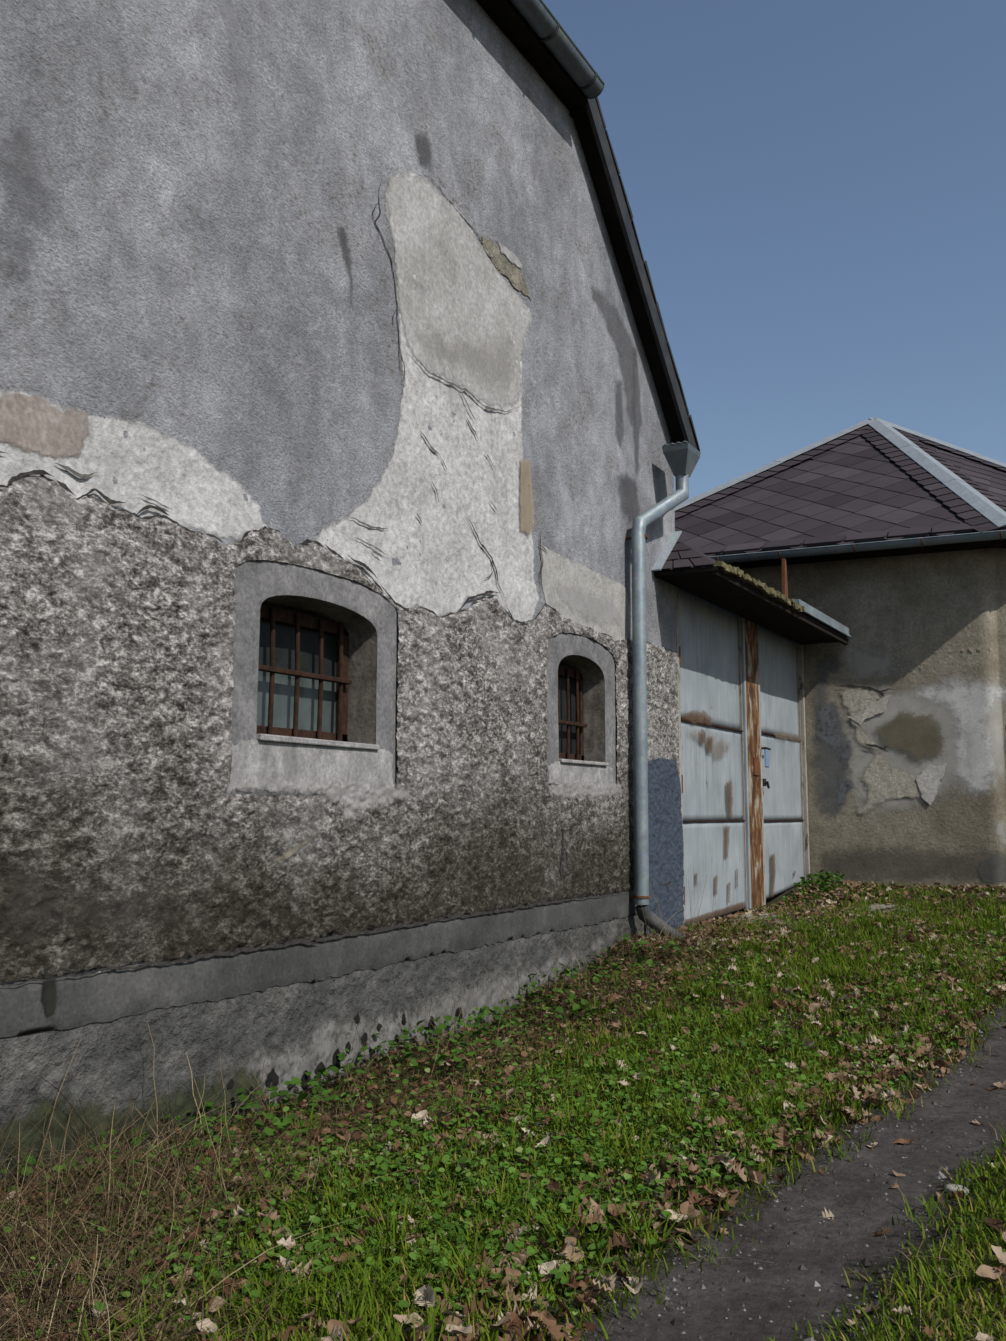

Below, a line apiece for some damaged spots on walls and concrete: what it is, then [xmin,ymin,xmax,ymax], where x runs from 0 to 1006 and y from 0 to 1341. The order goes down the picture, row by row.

spalling [0,390,280,543]
spalling [300,172,631,641]
crack [839,685,894,697]
peeling [840,685,947,813]
leakage [813,644,1006,815]
leakage [823,822,1006,882]